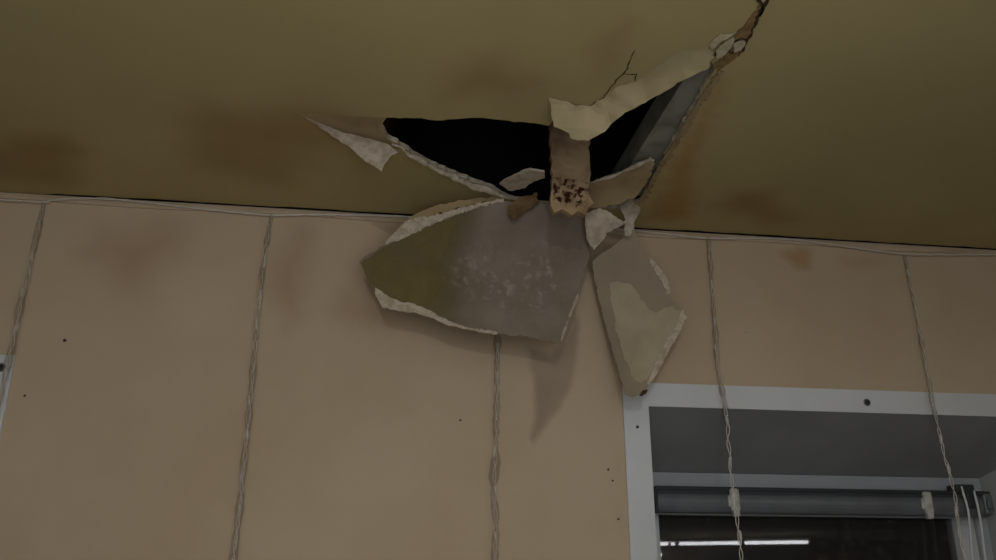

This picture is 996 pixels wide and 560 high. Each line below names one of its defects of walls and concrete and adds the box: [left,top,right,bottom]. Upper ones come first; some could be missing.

crack [591,50,637,106]
peeling [549,47,715,141]
crack [709,0,769,70]
peeling [609,281,681,383]